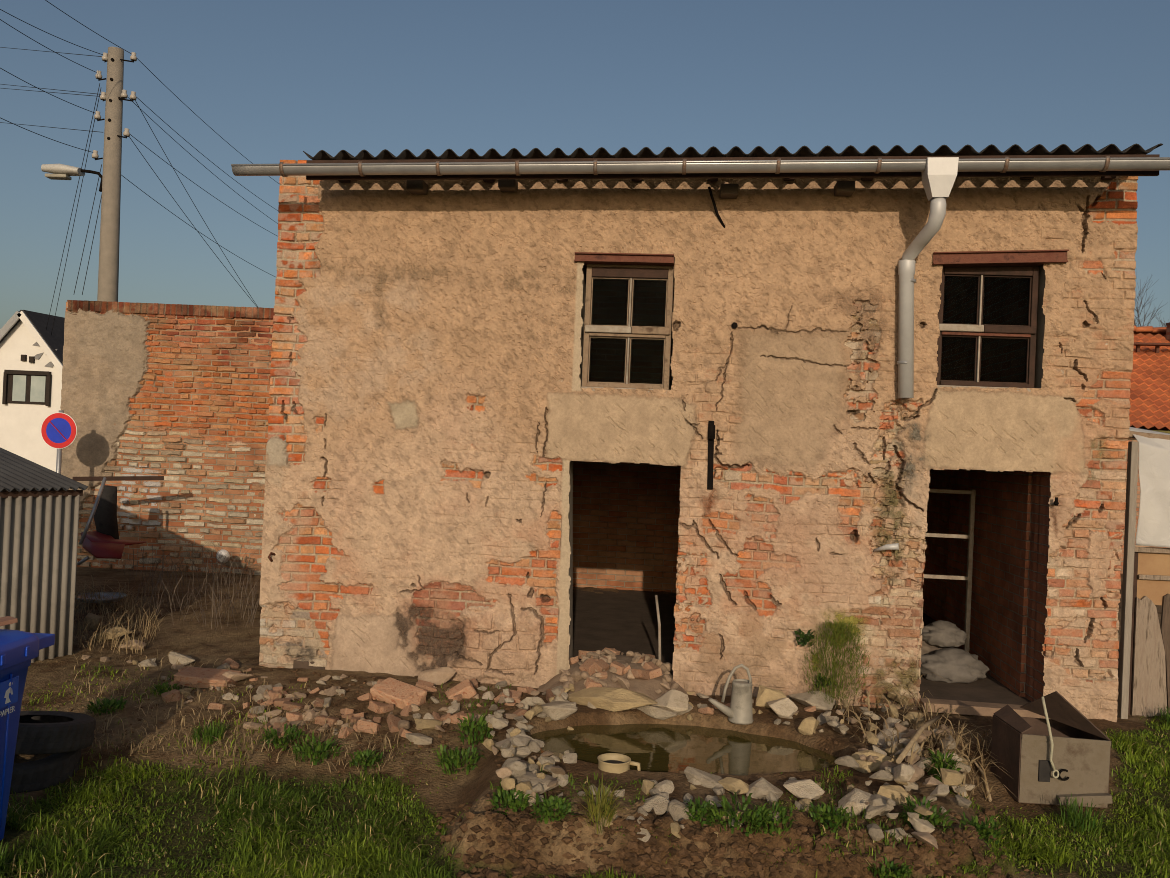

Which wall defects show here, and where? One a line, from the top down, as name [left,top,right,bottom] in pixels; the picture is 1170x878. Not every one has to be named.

flaking render [1086,176,1138,226]
flaking render [121,160,326,466]
flaking render [259,503,374,668]
flaking render [309,477,332,493]
flaking render [410,581,499,662]
flaking render [441,460,491,489]
crack [459,593,544,676]
flaking render [485,510,565,646]
crack [682,311,846,478]
flaking render [673,299,927,709]
crack [833,389,938,511]
flaking render [1042,368,1132,684]